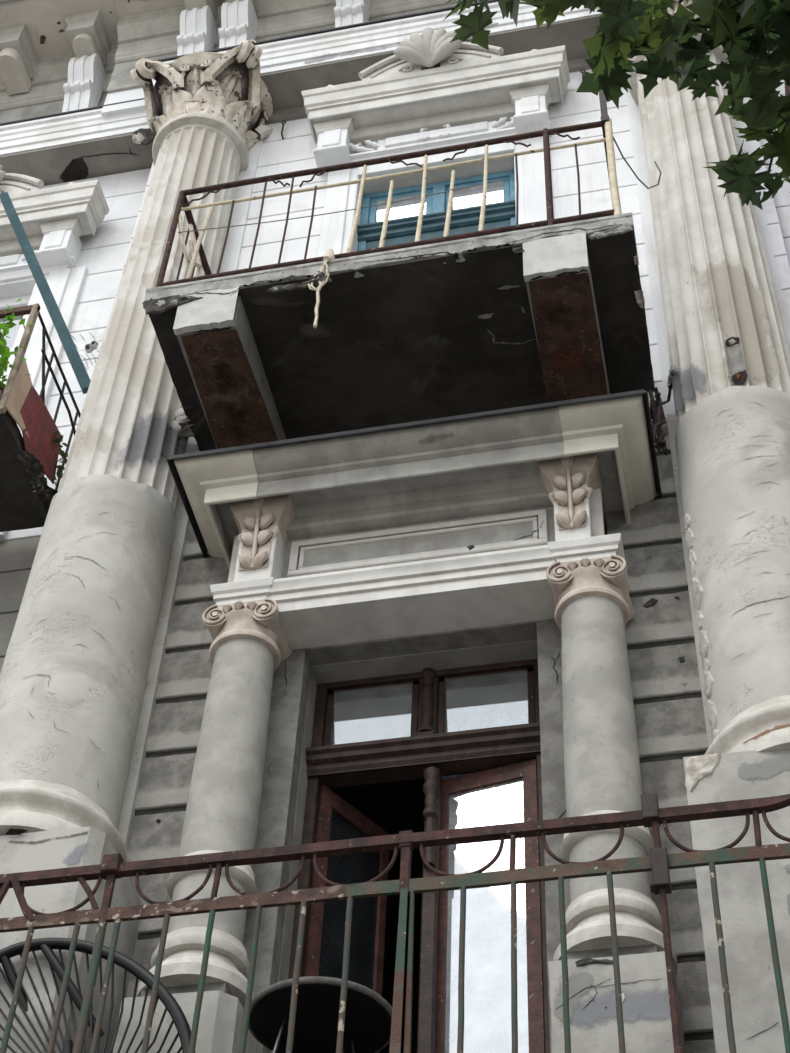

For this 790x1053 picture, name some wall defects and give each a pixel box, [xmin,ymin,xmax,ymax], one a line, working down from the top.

spalling [60,158,89,182]
crack [553,978,662,1012]